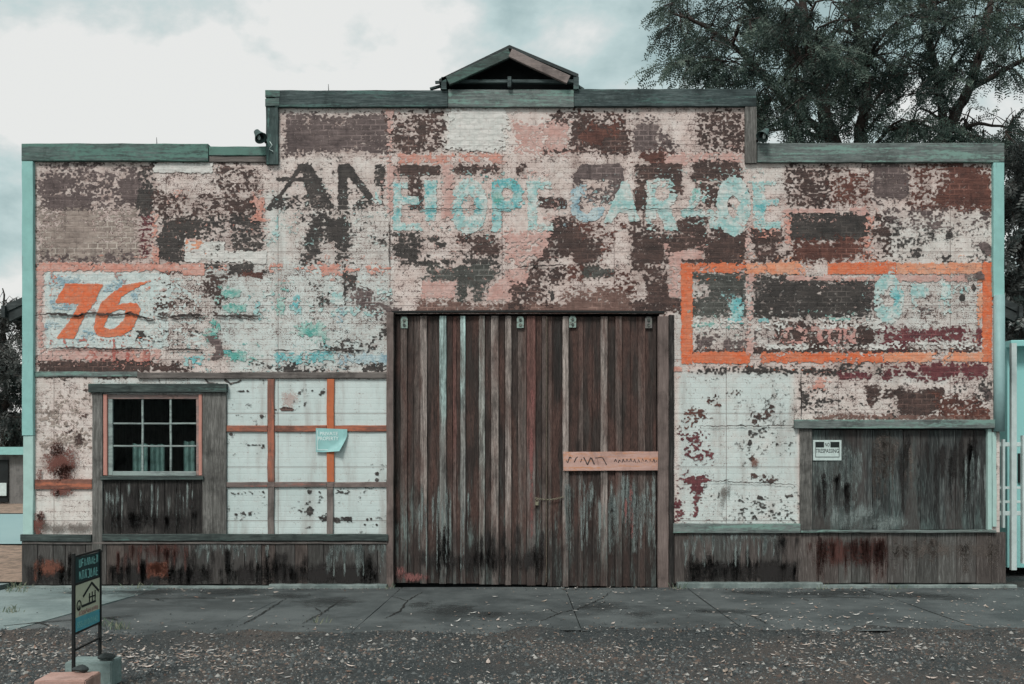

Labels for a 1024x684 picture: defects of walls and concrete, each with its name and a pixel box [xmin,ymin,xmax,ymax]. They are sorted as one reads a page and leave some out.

peeling [35,108,993,523]
rust [36,442,80,499]
peeling [291,487,386,533]
water stain [418,486,546,578]
water stain [565,476,656,551]
water stain [817,436,986,530]
water stain [27,554,72,594]
water stain [108,544,386,606]
water stain [684,533,868,596]